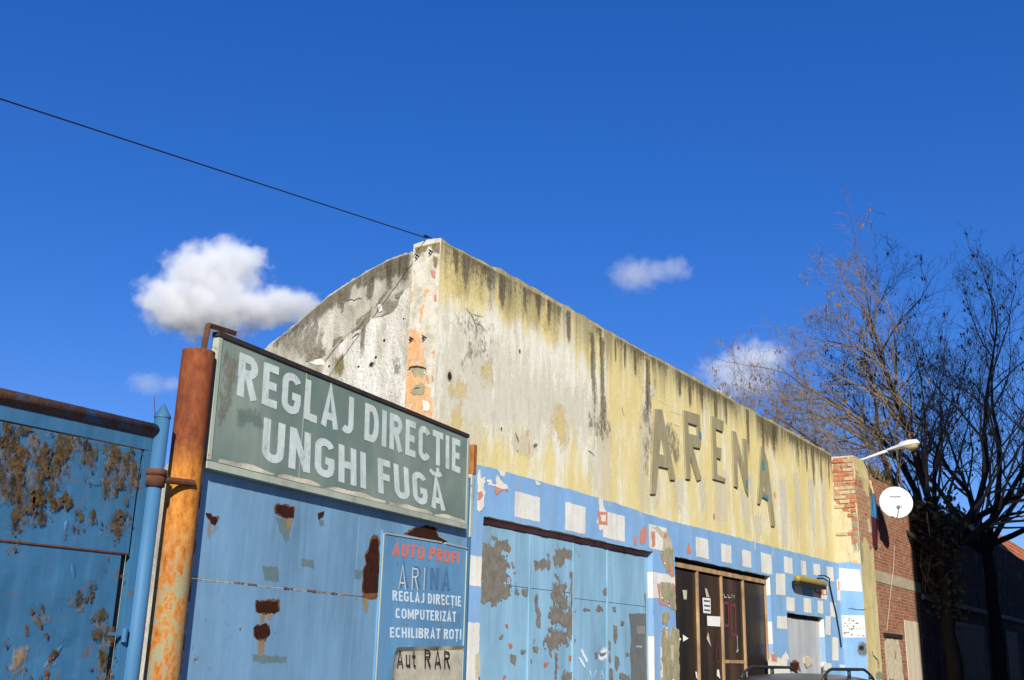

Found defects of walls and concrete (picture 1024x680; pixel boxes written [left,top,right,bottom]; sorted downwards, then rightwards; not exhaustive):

rust [0,422,142,557]
peeling [306,260,438,419]
damp [277,242,571,376]
damp [589,327,734,471]
damp [746,409,831,484]
flaking render [770,457,873,564]
rust [5,602,62,680]
rust [75,581,117,680]
rust [180,534,380,674]
peeling [481,525,681,680]